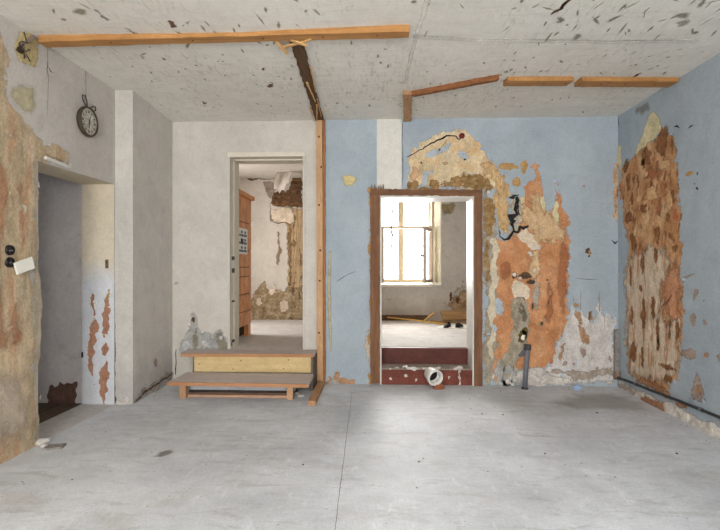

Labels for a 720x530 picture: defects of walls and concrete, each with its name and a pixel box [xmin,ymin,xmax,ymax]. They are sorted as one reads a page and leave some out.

crack [402,122,452,186]
flaking render [0,30,78,464]
flaking render [271,178,303,208]
crack [498,195,529,241]
peeling [406,111,720,439]
peeling [87,289,111,404]
peeling [179,313,233,358]
peeling [326,372,355,384]